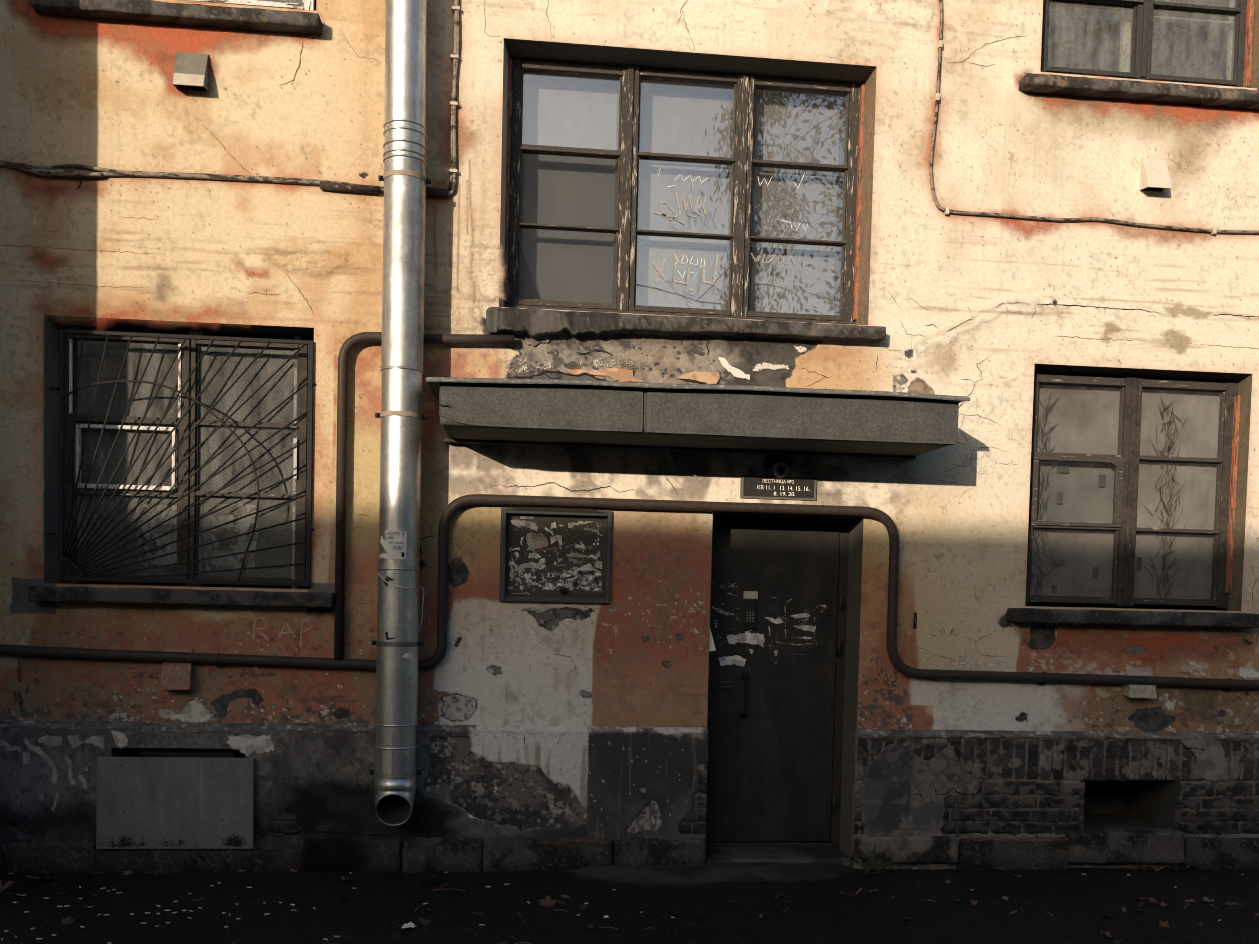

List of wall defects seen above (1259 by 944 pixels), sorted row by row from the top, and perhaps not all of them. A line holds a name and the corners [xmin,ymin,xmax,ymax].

corrosion [10,0,312,94]
spalling [480,318,814,387]
crack [876,290,1161,371]
crack [1190,314,1259,349]
crack [935,358,1017,498]
peeling [158,671,276,723]
spalling [528,609,593,630]
spalling [1029,625,1055,661]
peeling [1239,666,1259,679]
spalling [423,736,587,831]
spalling [627,788,662,833]
spalling [853,693,1259,837]